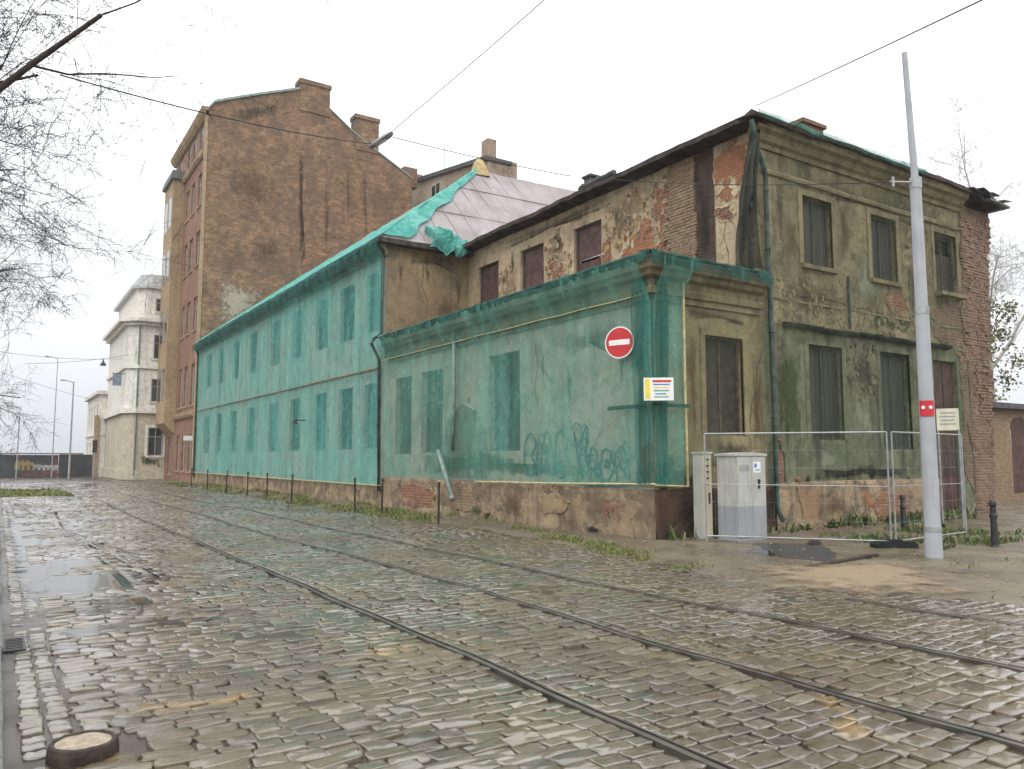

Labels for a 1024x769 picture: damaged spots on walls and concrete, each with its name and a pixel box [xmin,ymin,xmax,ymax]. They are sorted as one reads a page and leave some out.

flaking render [712,136,748,223]
flaking render [498,266,517,297]
flaking render [544,227,572,282]
flaking render [600,181,671,264]
flaking render [400,397,489,516]